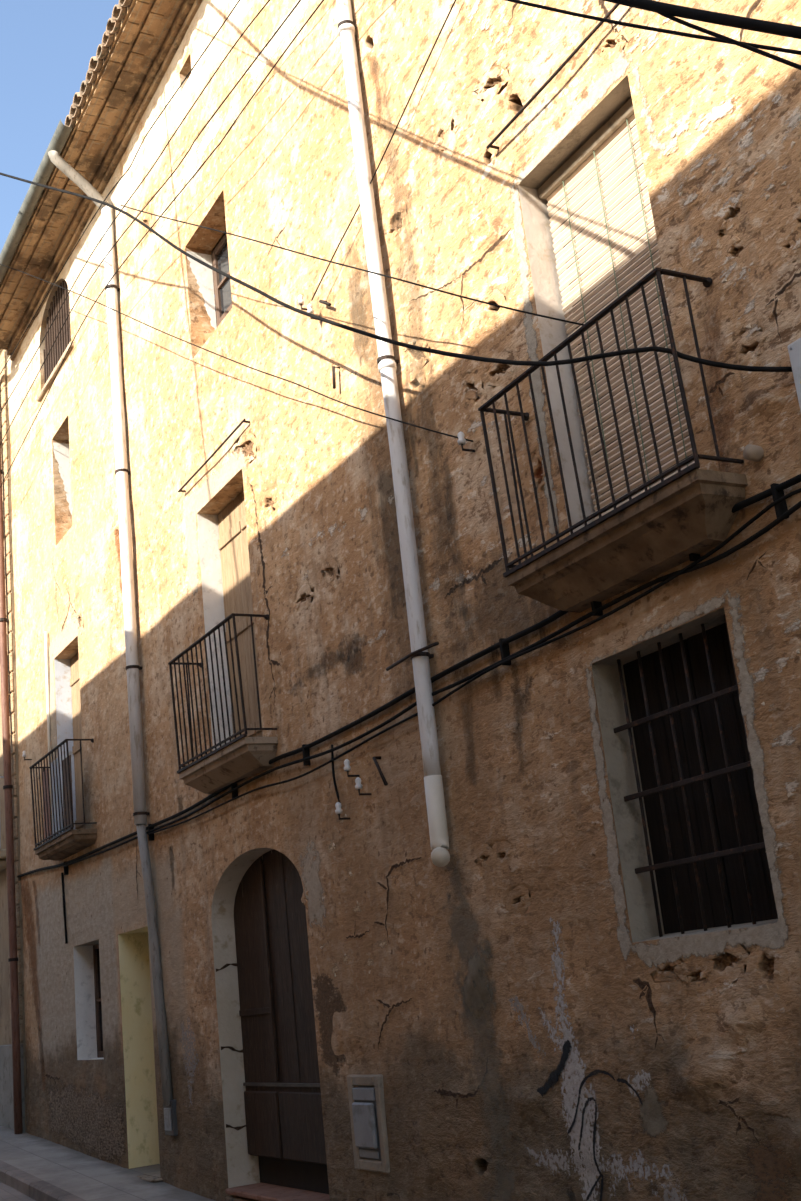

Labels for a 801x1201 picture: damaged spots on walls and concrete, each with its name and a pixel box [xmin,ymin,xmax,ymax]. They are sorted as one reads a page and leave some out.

crack [508,0,532,25]
crack [594,0,630,46]
crack [738,0,763,42]
crack [247,474,281,712]
spalling [293,557,341,612]
crack [346,854,422,945]
spalling [647,942,787,999]
spalling [313,954,348,1076]
crack [376,996,412,1053]
crack [633,975,666,1051]